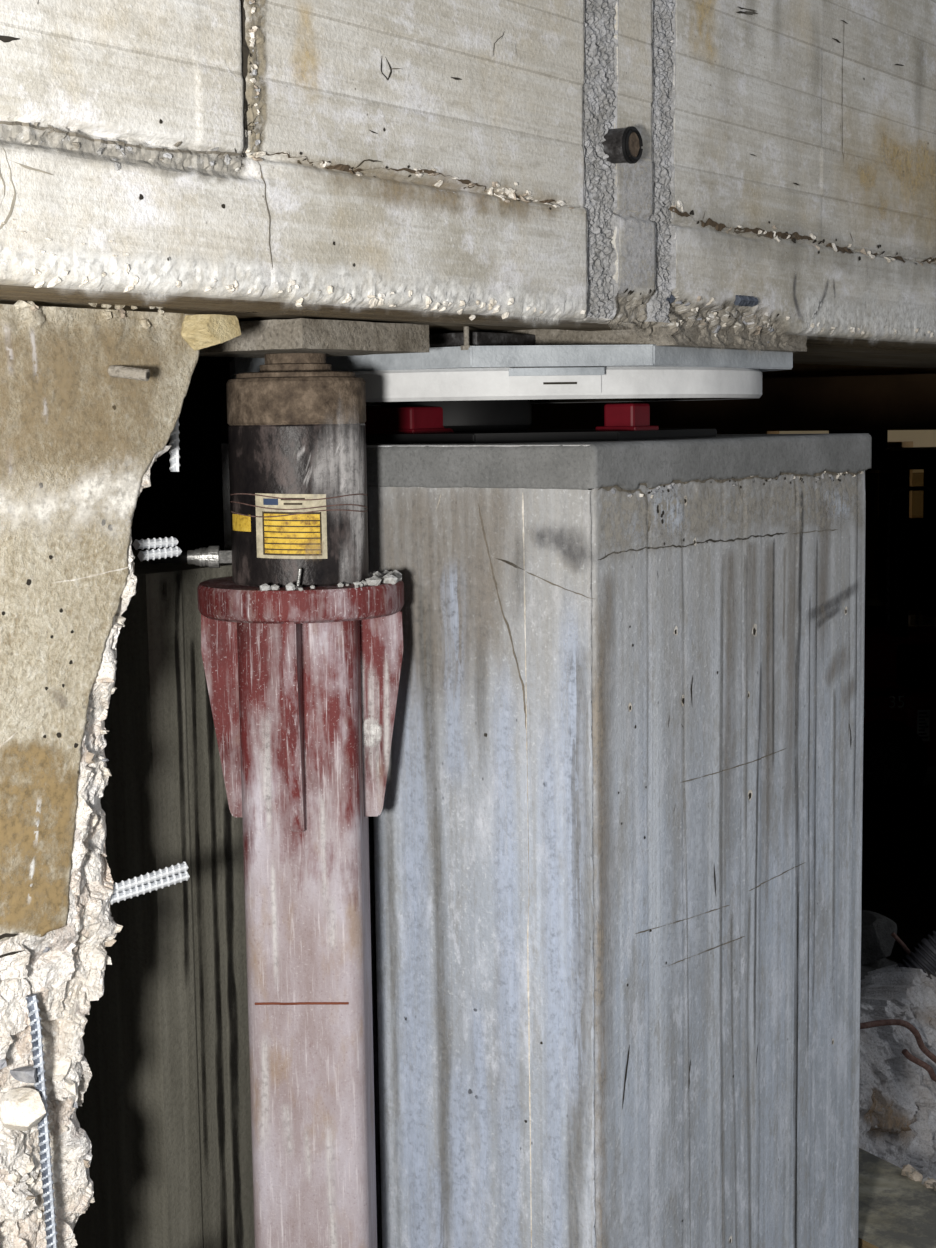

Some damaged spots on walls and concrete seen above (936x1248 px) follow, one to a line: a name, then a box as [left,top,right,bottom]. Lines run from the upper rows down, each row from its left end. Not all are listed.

crack [234,0,579,267]
crack [669,200,936,266]
spalling [608,288,792,351]
spalling [805,296,936,338]
spalling [138,417,180,497]
crack [598,471,864,560]
crack [478,503,593,728]
water stain [0,743,75,937]
spalling [0,536,190,1248]
crack [0,933,24,958]
spalling [860,1019,936,1082]